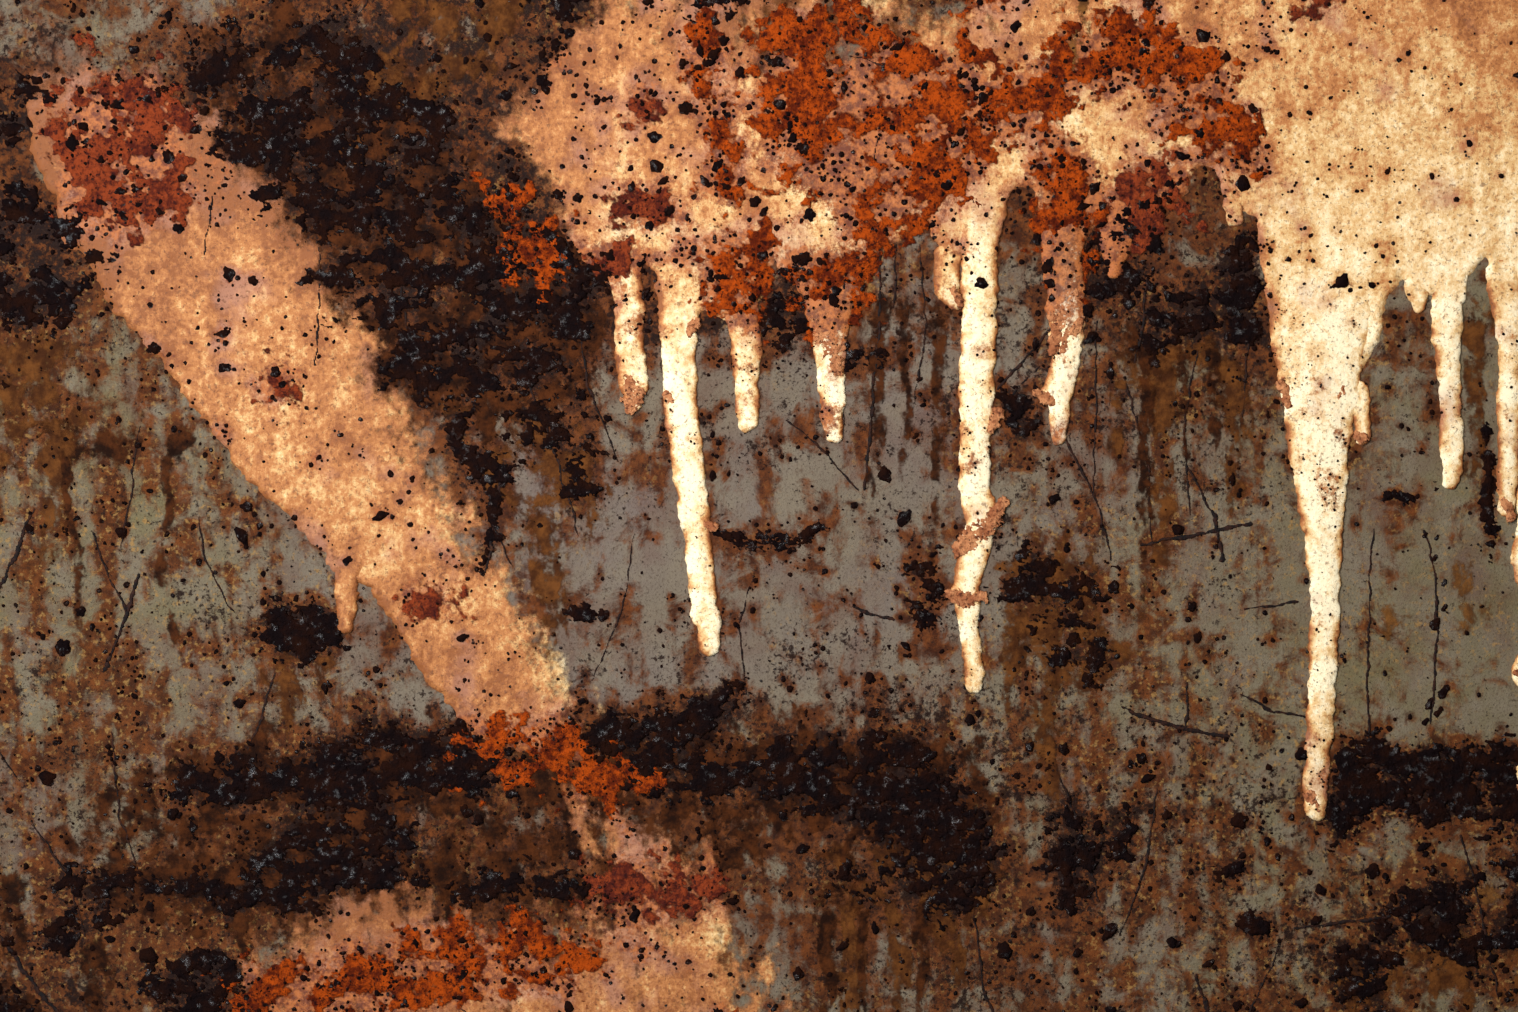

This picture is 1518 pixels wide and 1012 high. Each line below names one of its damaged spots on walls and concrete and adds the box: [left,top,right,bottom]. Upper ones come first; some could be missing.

corrosion [1332,42,1463,96]
corrosion [1292,147,1440,198]
corrosion [1279,226,1316,280]
corrosion [189,266,318,438]
corrosion [299,416,365,470]
corrosion [645,399,740,497]
corrosion [1281,400,1360,549]
corrosion [221,489,353,566]
corrosion [695,506,830,635]
corrosion [10,629,71,661]
corrosion [1173,711,1518,1012]
corrosion [701,935,785,1012]